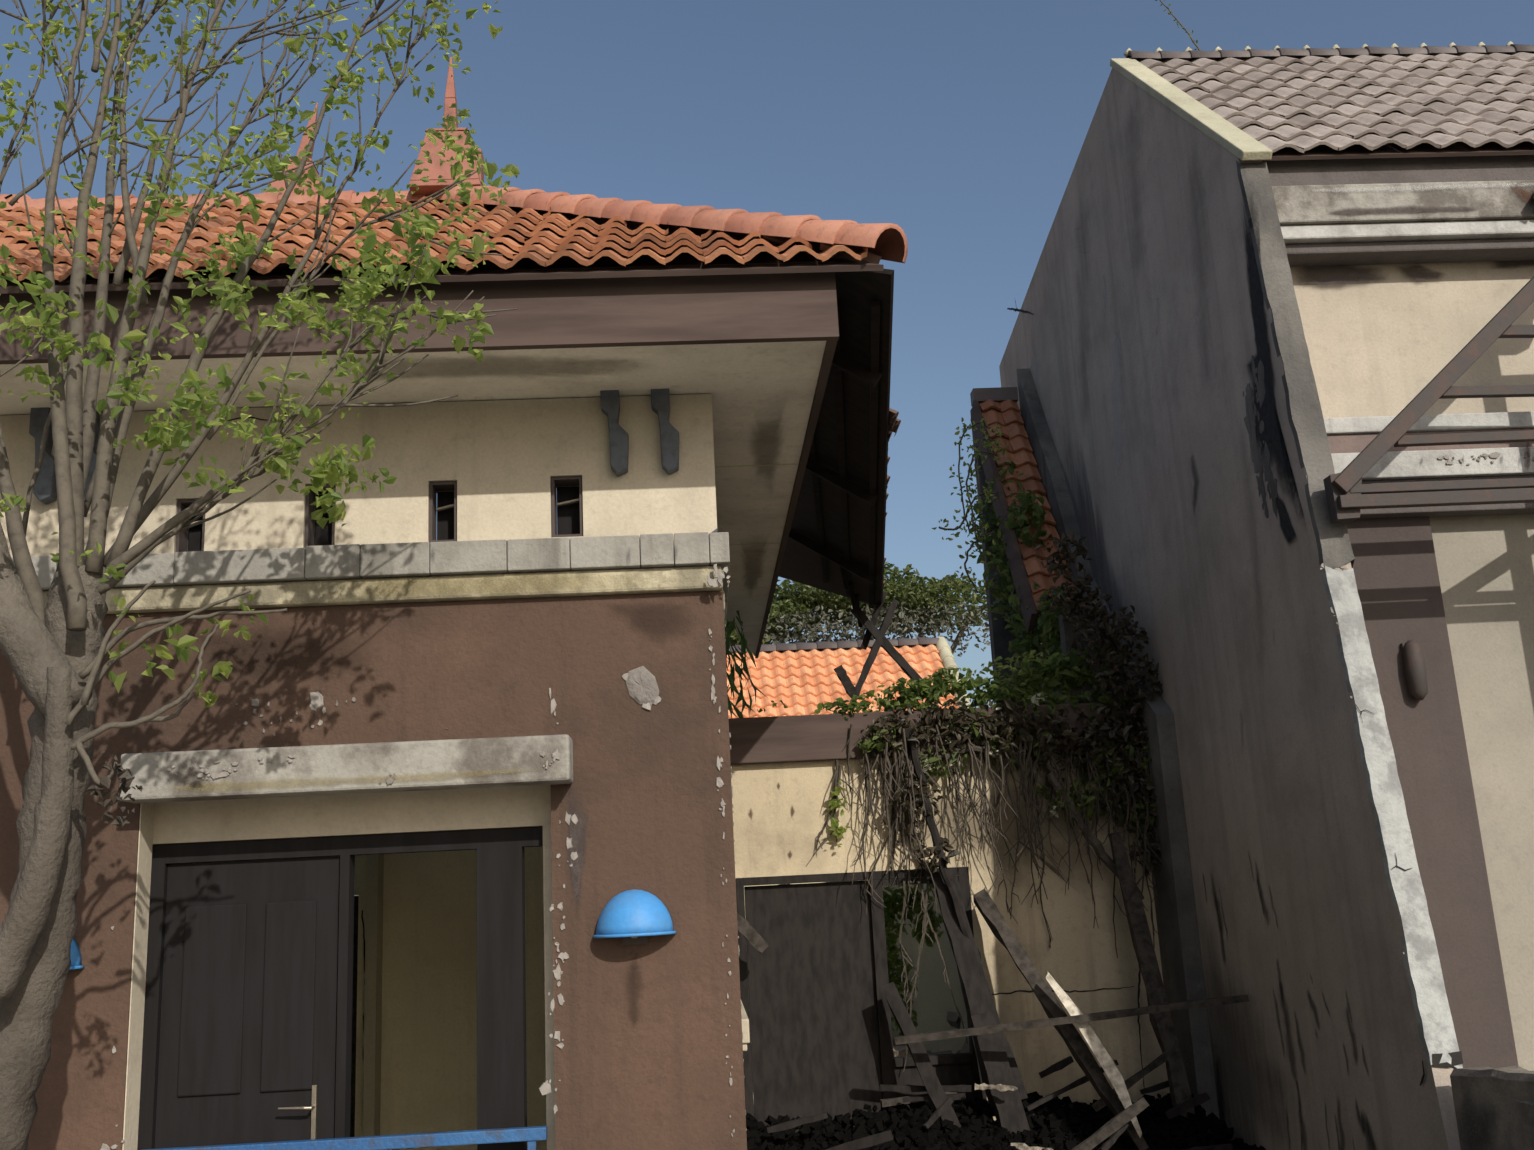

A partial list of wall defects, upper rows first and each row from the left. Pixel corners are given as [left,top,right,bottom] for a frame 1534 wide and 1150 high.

leakage [1245,208,1298,544]
peeling [235,691,356,737]
spalling [622,666,661,711]
peeling [708,629,735,842]
peeling [556,812,578,867]
peeling [548,884,569,1049]
peeling [539,1079,561,1114]